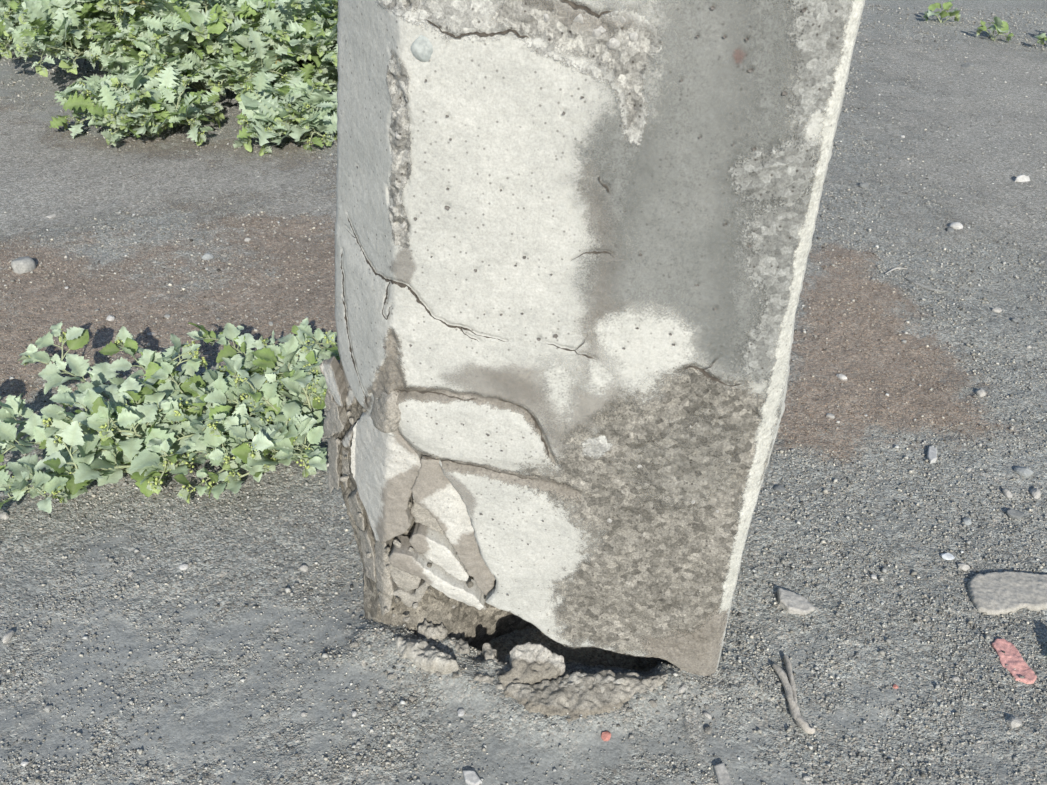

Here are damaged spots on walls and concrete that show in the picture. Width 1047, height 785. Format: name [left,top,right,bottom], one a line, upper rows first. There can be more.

crack [341,216,507,408]
spalling [319,328,537,648]
crack [397,390,549,457]
crack [422,456,534,480]
spalling [375,0,662,248]
crack [548,341,594,359]
crack [571,251,613,261]
spalling [516,0,854,657]
water stain [579,0,800,381]